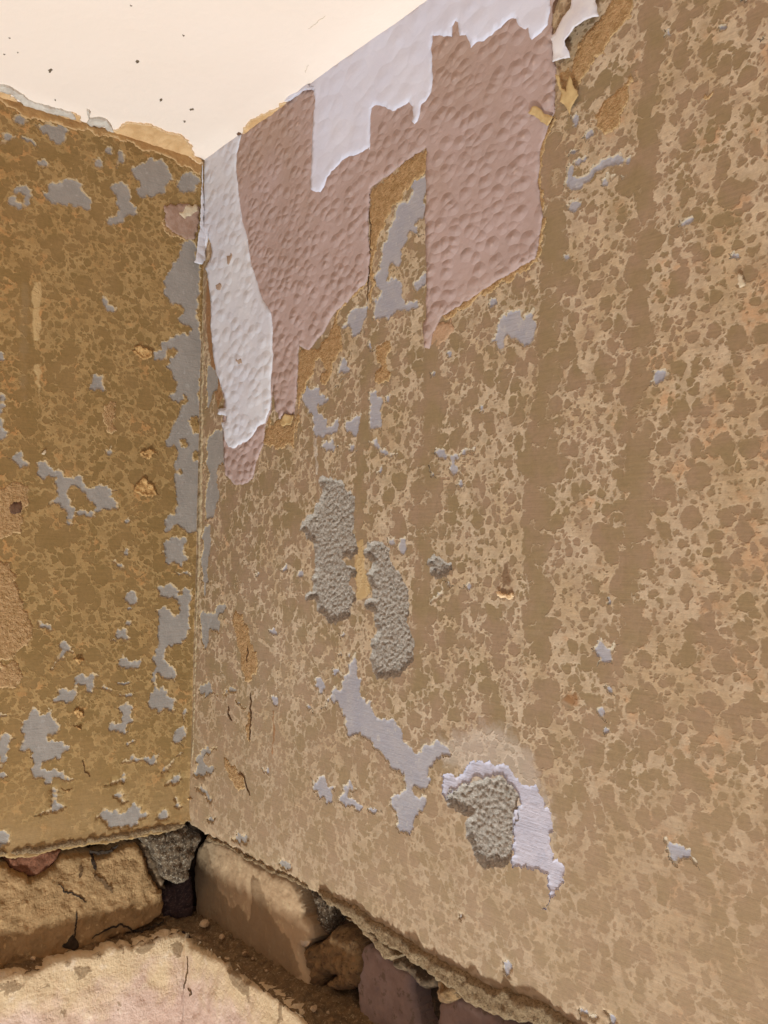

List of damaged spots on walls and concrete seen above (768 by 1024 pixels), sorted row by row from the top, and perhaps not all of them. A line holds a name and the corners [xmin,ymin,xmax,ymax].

peeling [0,114,69,169]
peeling [563,111,632,213]
peeling [341,174,426,352]
peeling [488,297,537,356]
peeling [300,356,398,477]
peeling [428,446,476,488]
peeling [0,239,251,876]
flaking render [279,475,565,910]
flaking render [206,816,616,1024]